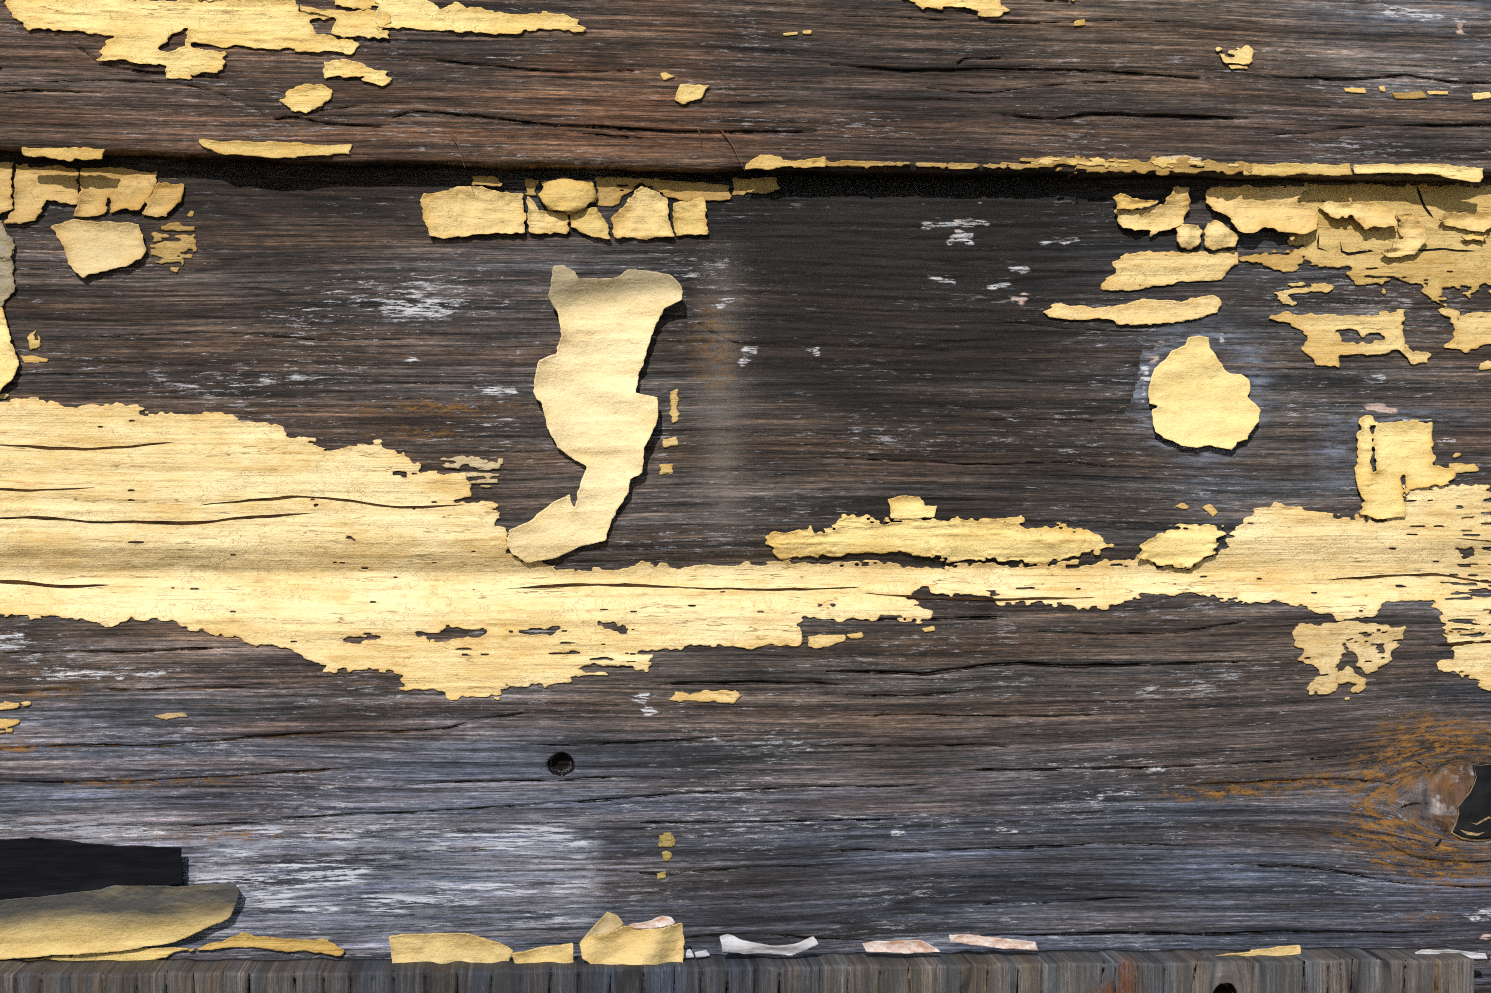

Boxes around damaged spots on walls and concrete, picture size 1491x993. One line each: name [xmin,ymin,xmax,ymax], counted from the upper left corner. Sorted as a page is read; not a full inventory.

peeling [4,0,586,113]
peeling [909,0,1010,17]
peeling [0,147,1491,700]
peeling [155,712,188,720]
peeling [634,690,741,716]
peeling [0,828,345,961]